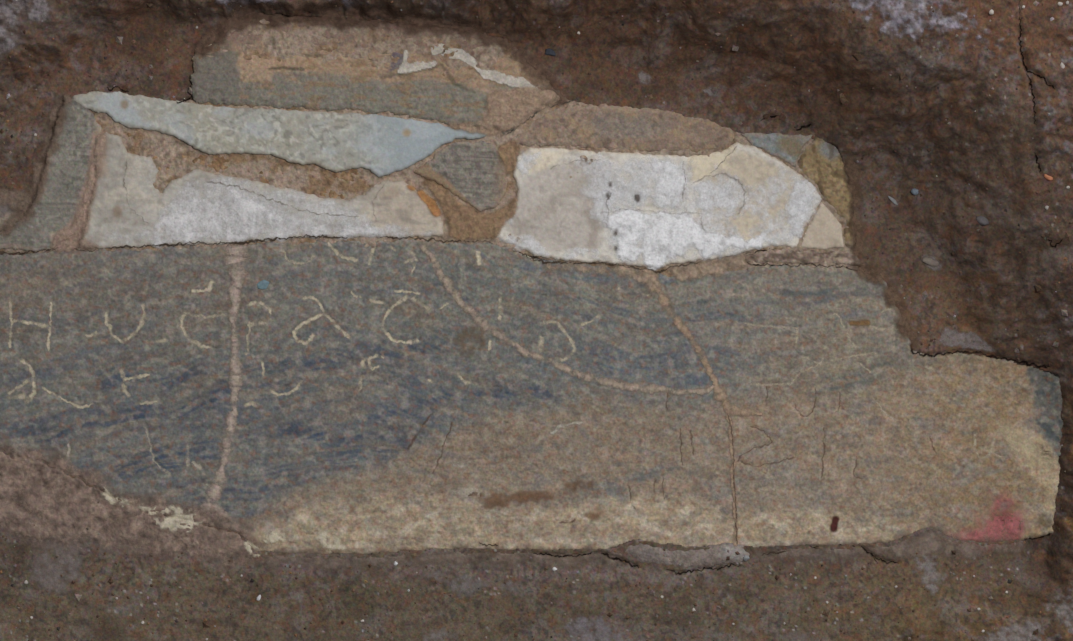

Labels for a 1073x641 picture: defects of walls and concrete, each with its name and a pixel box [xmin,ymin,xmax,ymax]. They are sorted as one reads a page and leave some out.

crack [1018,2,1055,125]
crack [380,236,898,575]